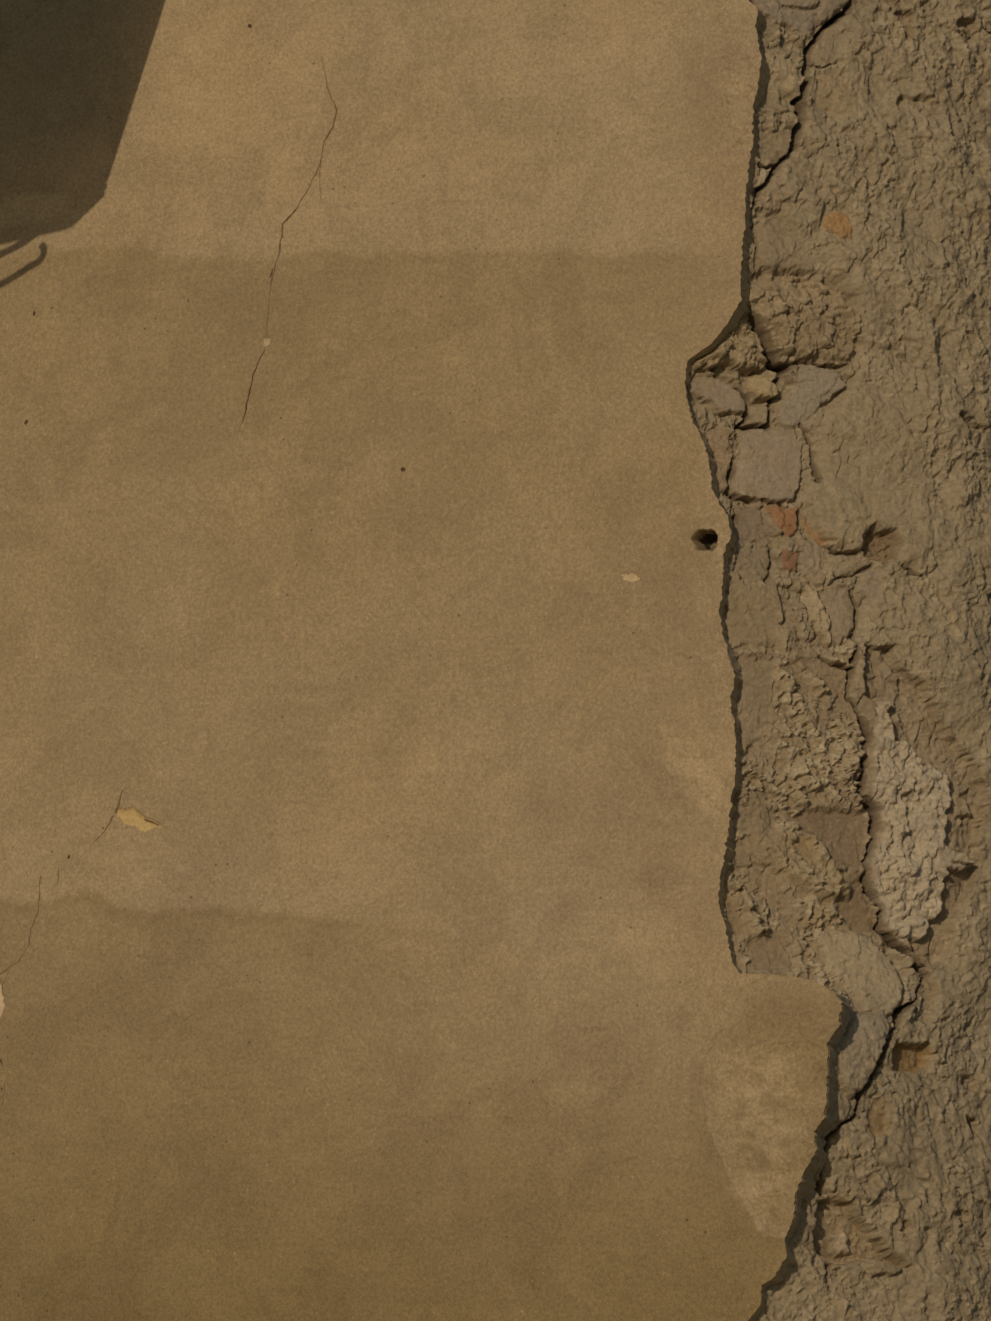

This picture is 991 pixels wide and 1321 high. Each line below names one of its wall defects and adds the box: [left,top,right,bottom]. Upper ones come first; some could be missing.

crack [239,56,337,430]
crack [724,0,857,522]
crack [763,546,773,581]
spalling [686,0,991,1099]
peeling [117,807,162,832]
crack [815,544,930,1199]
crack [953,859,973,867]
crack [819,1256,834,1284]
spalling [812,1197,908,1277]